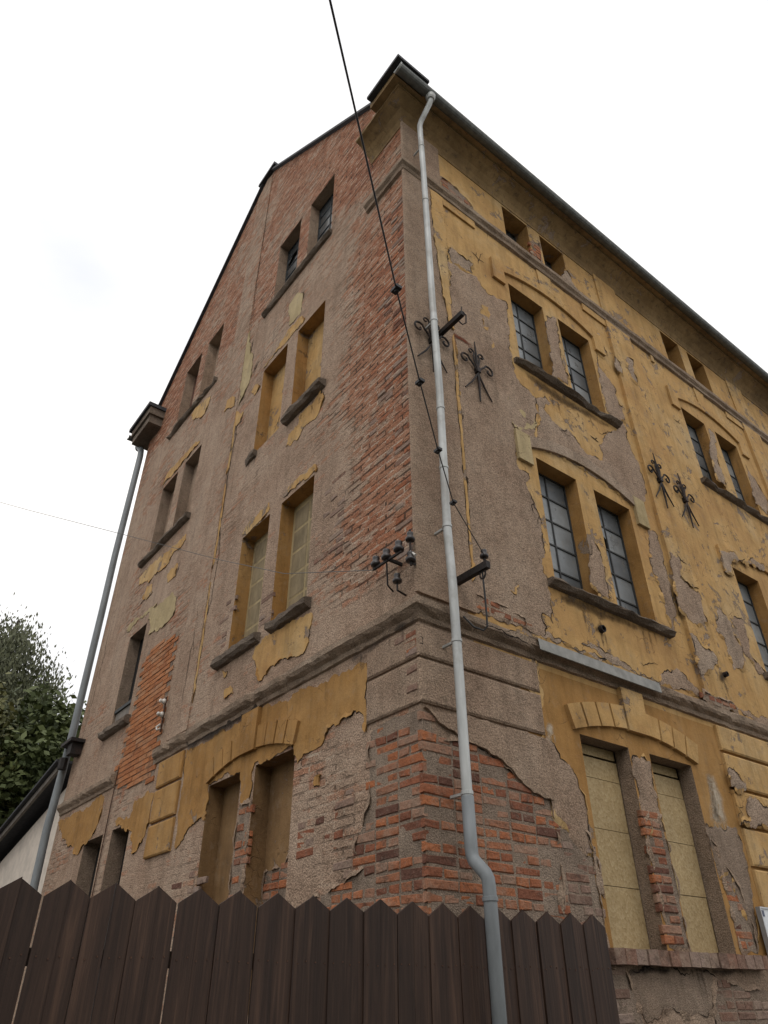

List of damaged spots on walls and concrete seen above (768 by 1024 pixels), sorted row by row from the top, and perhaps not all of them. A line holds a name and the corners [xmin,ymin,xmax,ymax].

flaking render [364,189,408,437]
flaking render [314,470,352,572]
flaking render [395,476,413,560]
flaking render [430,176,768,725]
peeling [252,592,313,682]
peeling [58,795,104,855]
peeling [115,791,154,854]
flaking render [172,662,610,948]
flaking render [631,753,692,952]
flaking render [705,767,768,955]